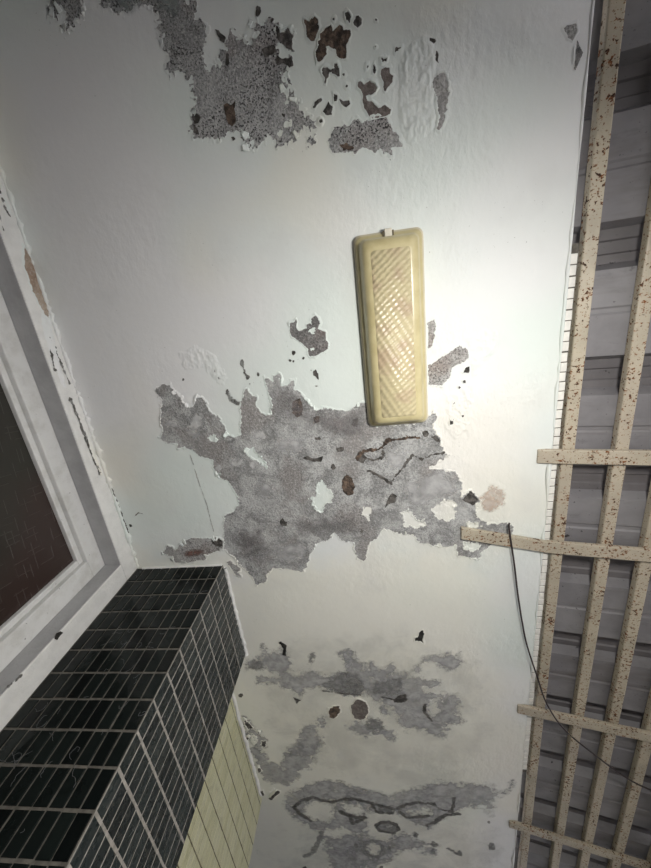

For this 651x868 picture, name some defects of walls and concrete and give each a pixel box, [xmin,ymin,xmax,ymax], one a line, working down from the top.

flaking render [46,0,406,159]
flaking render [0,166,143,568]
flaking render [286,312,330,387]
flaking render [426,317,471,390]
flaking render [154,371,516,587]
damp [248,641,462,740]
damp [286,780,514,868]